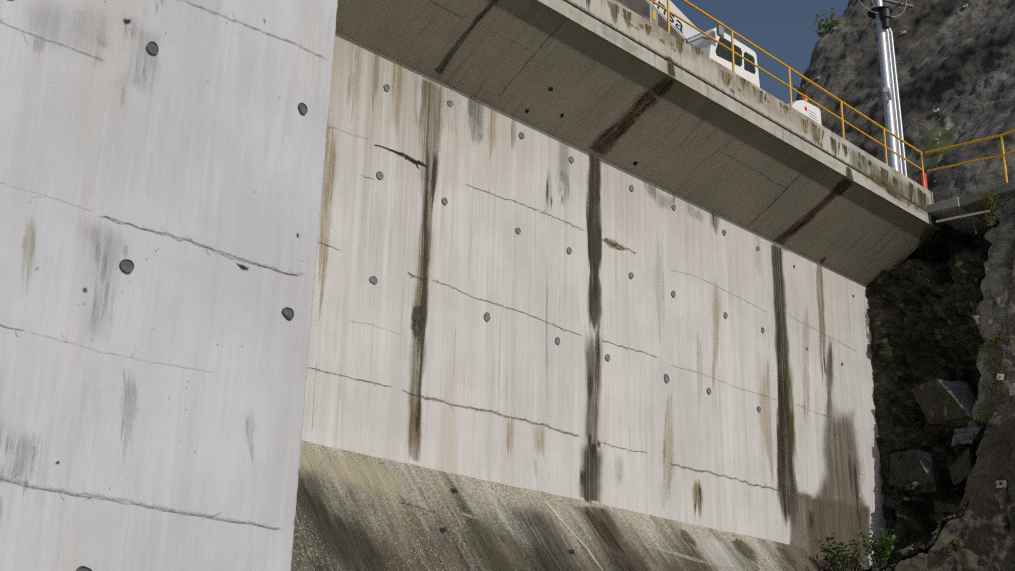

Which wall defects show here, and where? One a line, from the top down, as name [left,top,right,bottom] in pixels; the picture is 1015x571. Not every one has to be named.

water stain [436,0,498,73]
water stain [721,70,790,112]
water stain [897,35,1015,114]
water stain [801,118,926,207]
water stain [410,74,458,443]
water stain [581,155,647,571]
water stain [756,235,870,571]